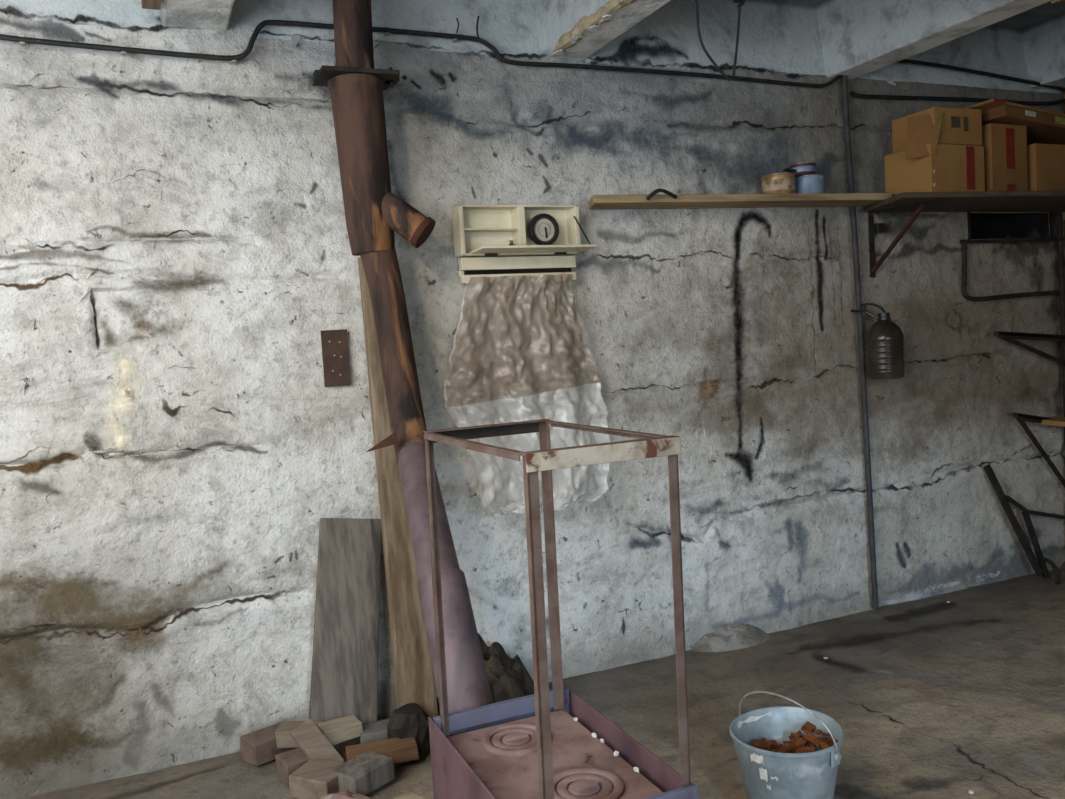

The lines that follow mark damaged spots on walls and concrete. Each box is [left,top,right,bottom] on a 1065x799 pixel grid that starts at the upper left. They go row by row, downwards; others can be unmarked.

crack [642,59,806,79]
crack [103,84,322,108]
damp [652,93,709,109]
crack [520,111,591,136]
crack [728,106,867,130]
damp [735,212,771,242]
crack [597,250,796,261]
crack [750,365,857,389]
crack [0,446,105,473]
crack [760,443,1056,506]
crack [639,528,694,542]
crack [3,593,280,644]